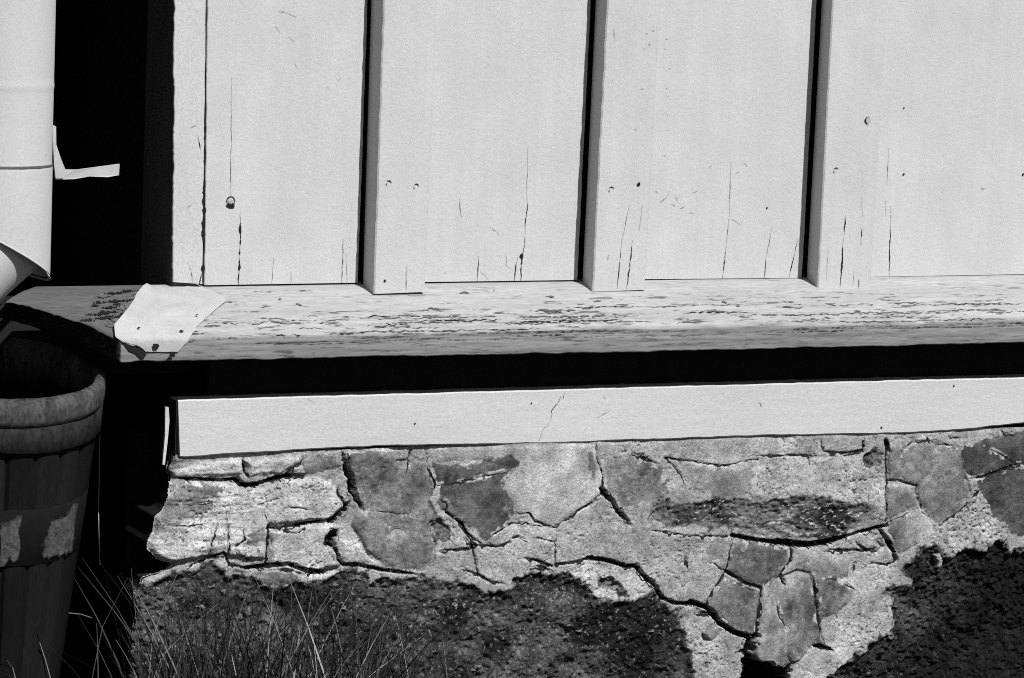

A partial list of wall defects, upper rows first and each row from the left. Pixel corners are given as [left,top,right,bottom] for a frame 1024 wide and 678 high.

crack [251,191,1024,345]
peeling [80,288,141,327]
peeling [188,290,458,342]
peeling [489,295,616,324]
peeling [777,300,915,326]
crack [169,428,1023,664]